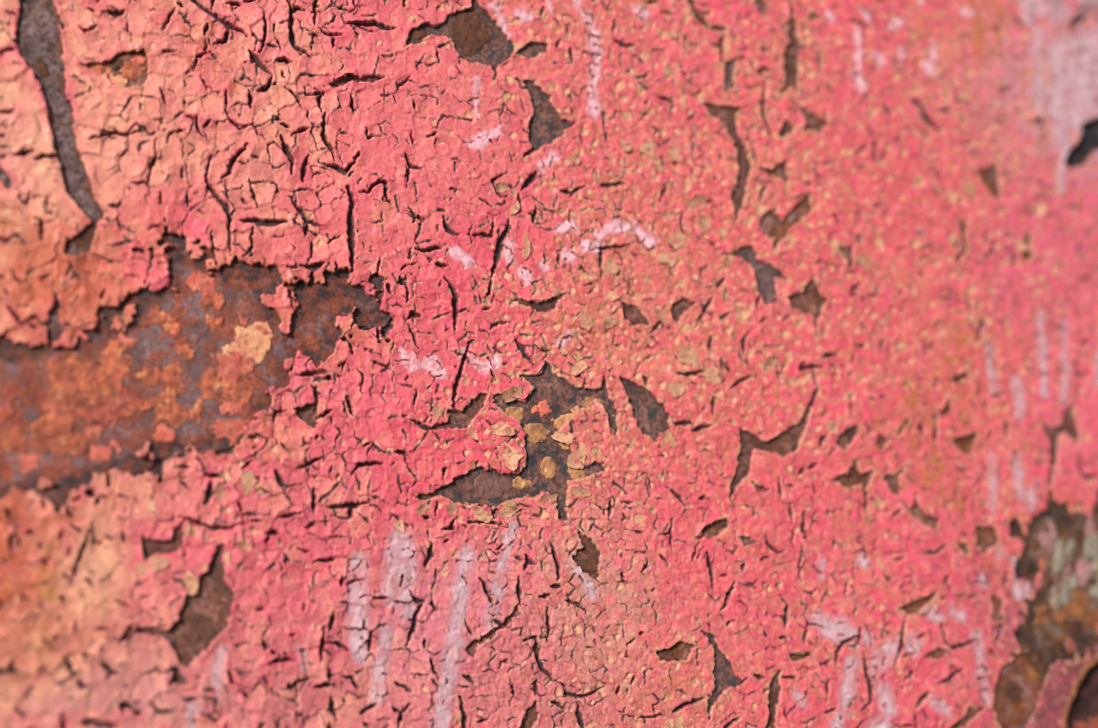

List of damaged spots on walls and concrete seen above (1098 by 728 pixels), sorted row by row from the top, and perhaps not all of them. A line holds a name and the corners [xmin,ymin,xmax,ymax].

peeling [13,0,109,261]
crack [93,0,418,299]
peeling [406,0,546,86]
crack [401,212,457,344]
crack [482,175,545,363]
peeling [0,235,391,511]
crack [149,365,363,585]
peeling [417,347,618,524]
peeling [125,545,240,694]
crack [262,614,408,728]
crack [500,546,633,728]
peeling [947,499,1098,728]